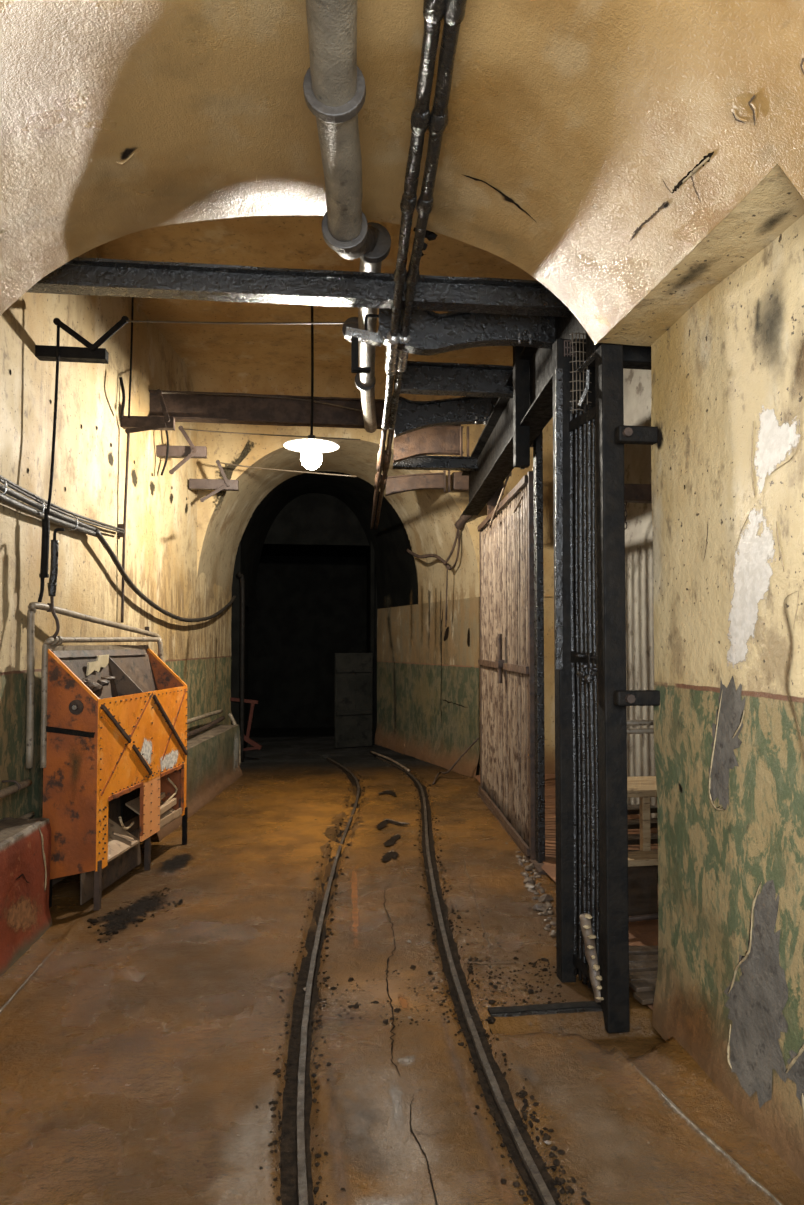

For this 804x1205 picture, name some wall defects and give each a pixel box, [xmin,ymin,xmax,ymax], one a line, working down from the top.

crack [629,151,714,242]
peeling [708,406,800,811]
crack [383,879,449,1205]
flaking render [724,880,804,1119]